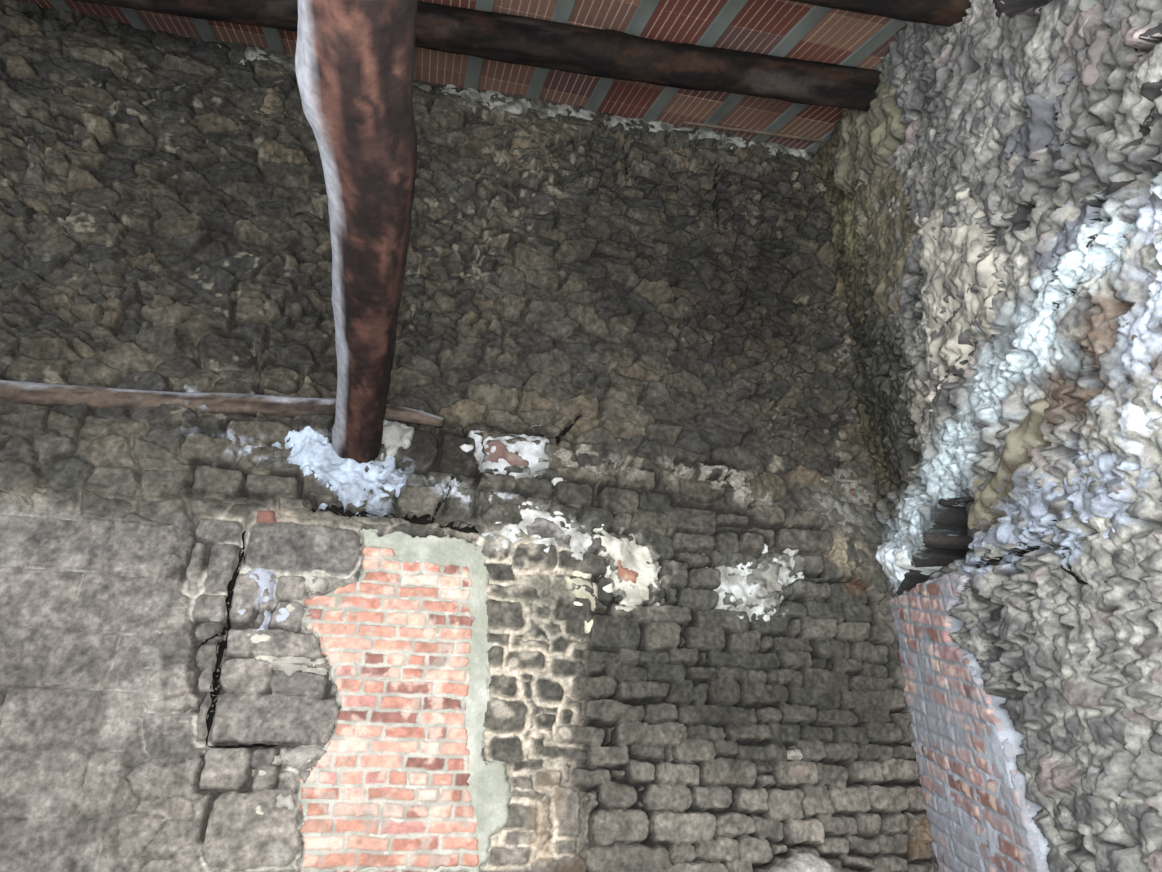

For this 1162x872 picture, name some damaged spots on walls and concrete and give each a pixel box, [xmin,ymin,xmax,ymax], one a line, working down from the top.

flaking render [461,440,529,467]
leakage [811,187,1162,591]